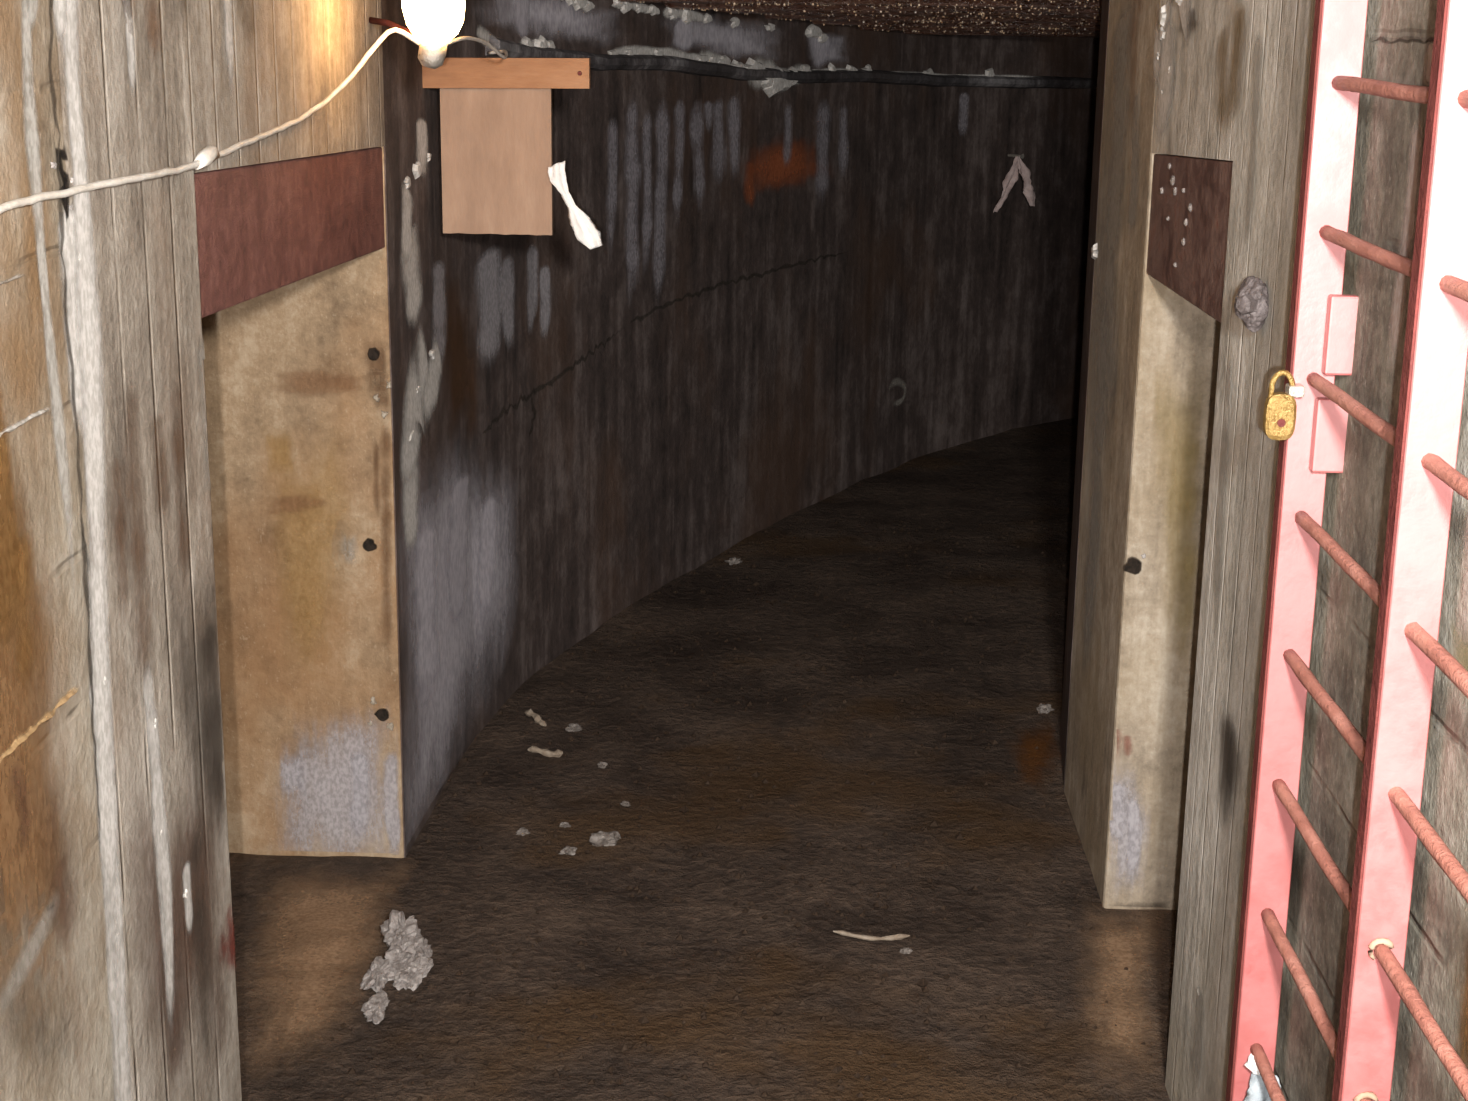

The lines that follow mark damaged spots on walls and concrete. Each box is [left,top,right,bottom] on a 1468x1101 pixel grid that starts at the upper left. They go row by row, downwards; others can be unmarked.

water stain [609,100,739,284]
water stain [818,107,846,191]
water stain [959,94,967,131]
water stain [479,247,550,357]
water stain [402,119,508,792]
water stain [282,732,400,852]